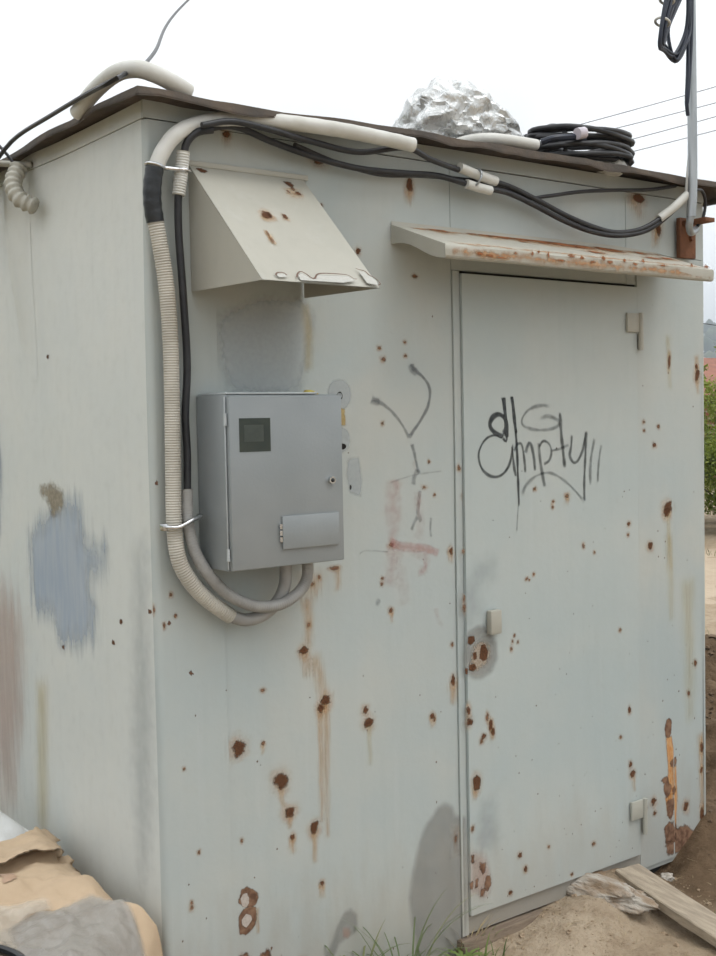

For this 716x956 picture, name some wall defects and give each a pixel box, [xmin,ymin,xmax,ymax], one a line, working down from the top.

rust [414,228,708,275]
peeling [275,268,381,285]
rust [451,636,488,685]
rust [273,773,289,790]
rust [652,718,693,855]
rust [470,855,491,898]
rust [238,877,259,935]